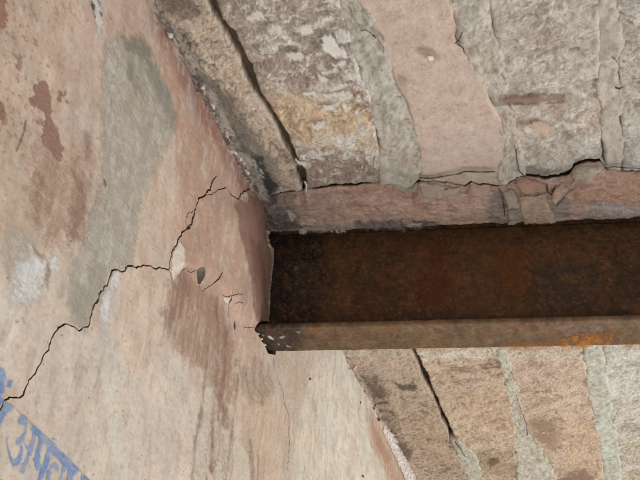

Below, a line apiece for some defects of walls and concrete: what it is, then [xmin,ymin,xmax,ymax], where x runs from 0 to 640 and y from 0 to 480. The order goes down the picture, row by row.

peeling [30,81,69,161]
crack [416,171,495,185]
crack [514,145,640,205]
peeling [171,242,186,280]
crack [0,176,250,411]
corrosion [502,332,618,352]